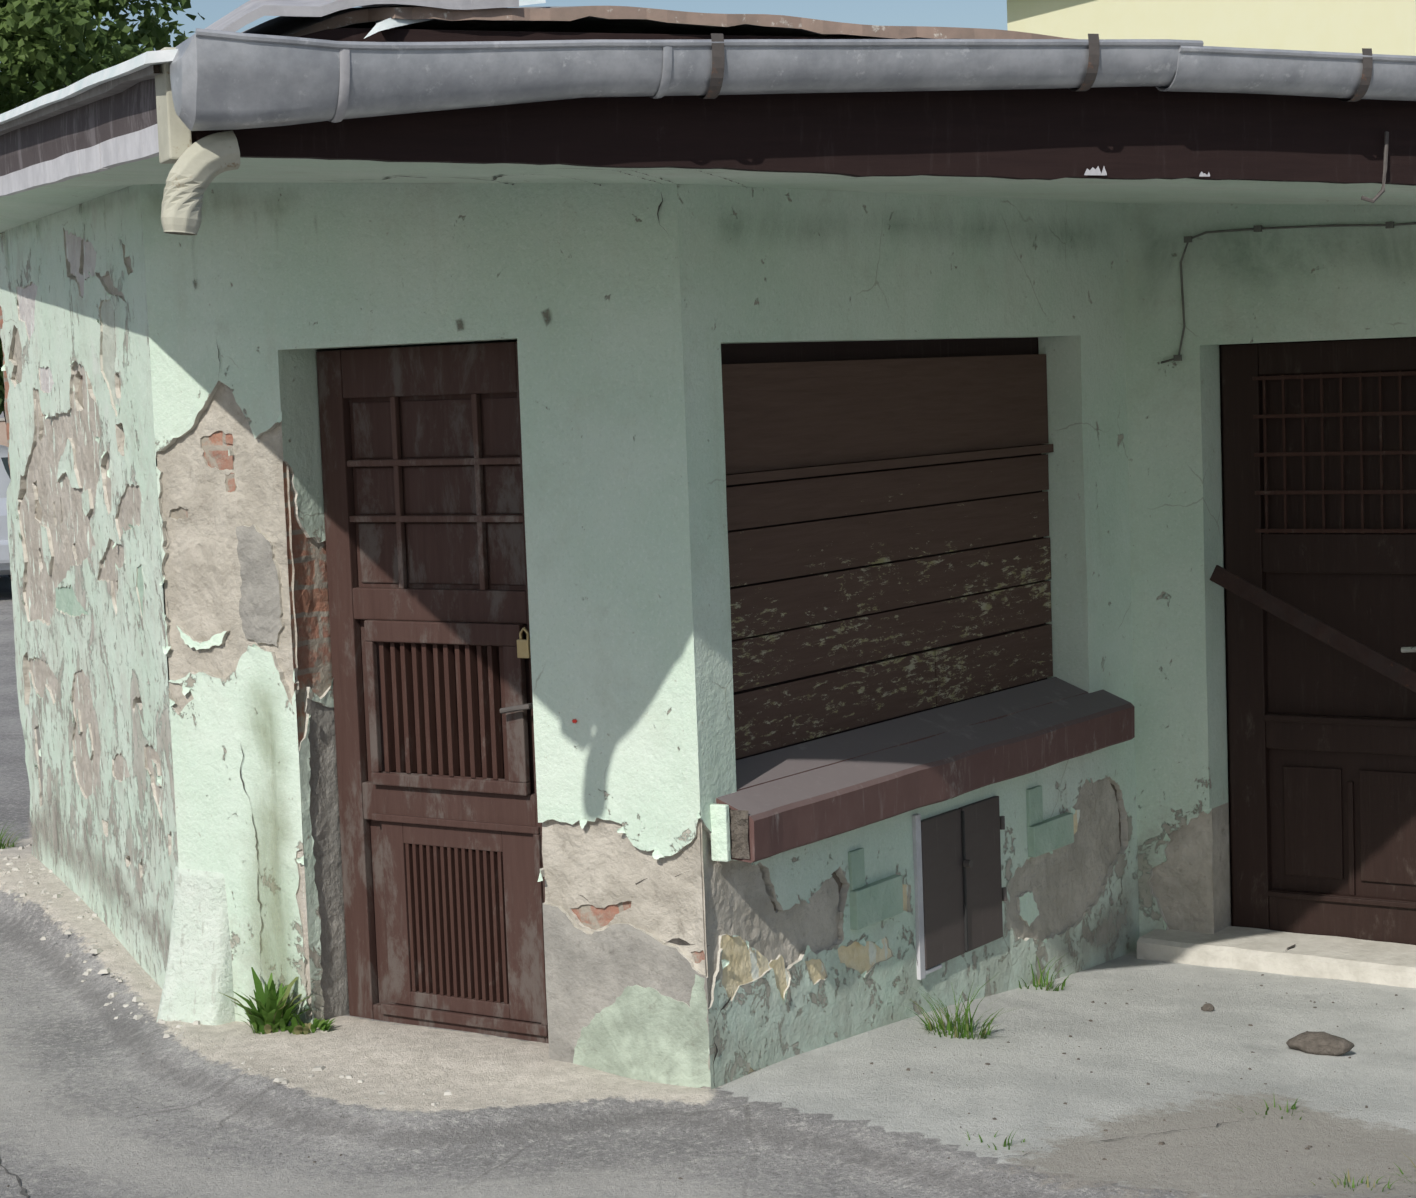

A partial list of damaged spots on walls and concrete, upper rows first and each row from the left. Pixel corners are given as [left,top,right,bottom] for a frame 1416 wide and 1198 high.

spalling [0,273,349,1020]
spalling [538,811,892,1090]
spalling [1008,777,1121,943]
spalling [1150,803,1231,934]